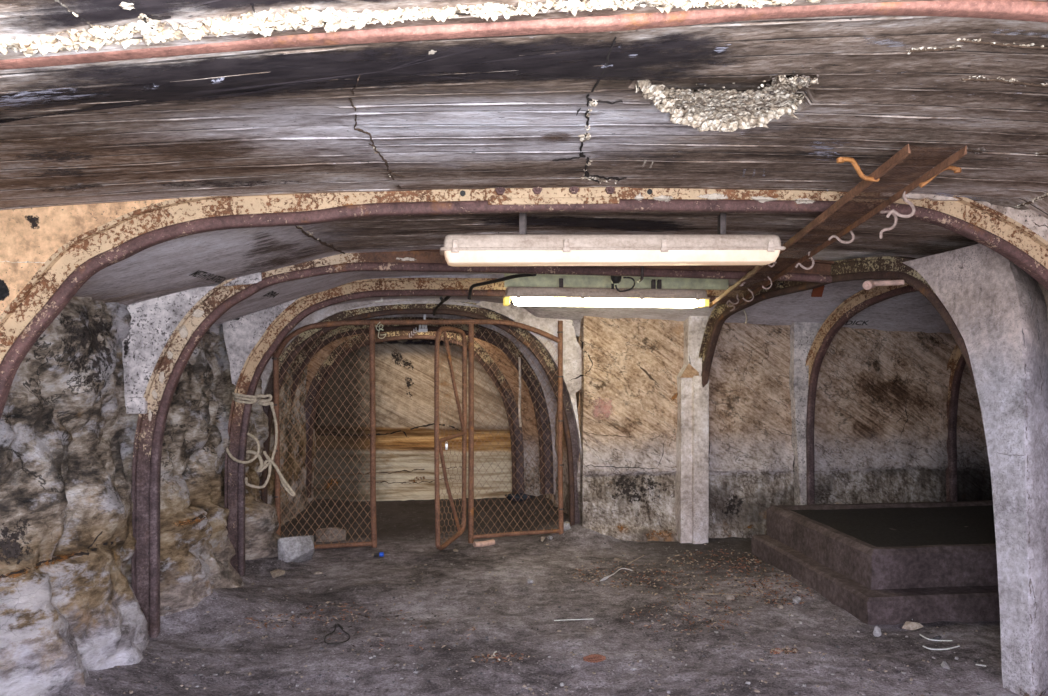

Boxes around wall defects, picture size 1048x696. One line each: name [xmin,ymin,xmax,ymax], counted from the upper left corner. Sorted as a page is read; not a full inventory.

damp [0,88,91,107]
crack [552,37,627,184]
crack [349,74,405,188]
damp [0,131,116,192]
damp [161,140,255,161]
damp [140,180,302,188]
corrosion [0,550,85,579]